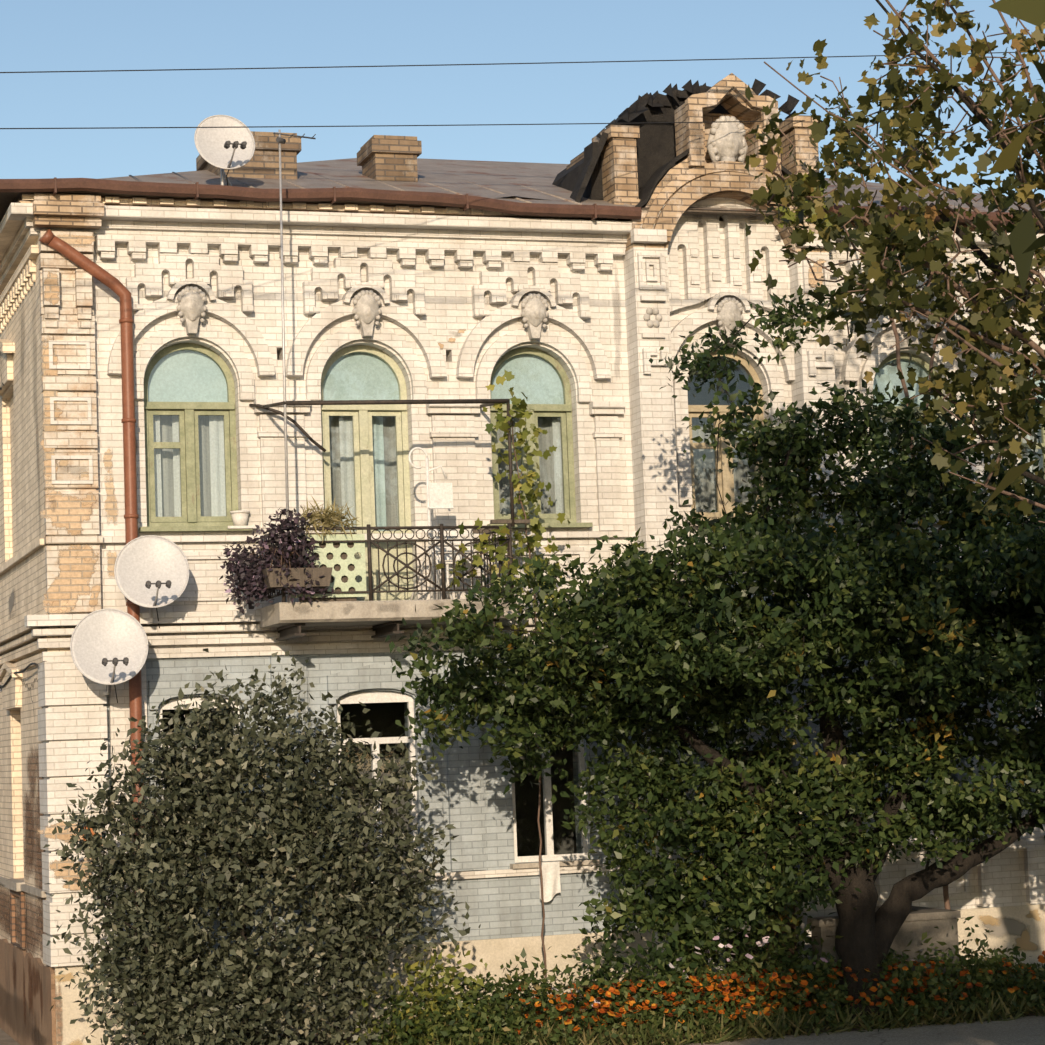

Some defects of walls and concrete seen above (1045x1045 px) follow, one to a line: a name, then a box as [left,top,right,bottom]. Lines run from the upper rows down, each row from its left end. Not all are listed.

peeling [41,338,58,376]
peeling [40,390,117,614]
peeling [0,752,103,956]
peeling [55,973,81,1045]